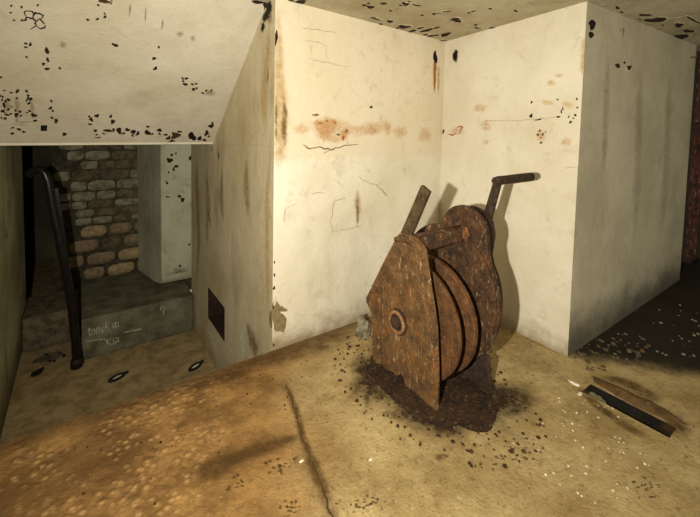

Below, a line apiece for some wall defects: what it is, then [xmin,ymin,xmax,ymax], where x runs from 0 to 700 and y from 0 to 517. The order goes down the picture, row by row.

spalling [421,10,476,23]
spalling [637,14,700,40]
peeling [0,89,59,131]
peeling [88,114,214,142]
water stain [263,49,287,139]
corrosion [312,114,337,137]
crack [304,144,358,154]
crack [313,192,359,232]
spalling [269,286,288,346]
crack [285,384,334,517]